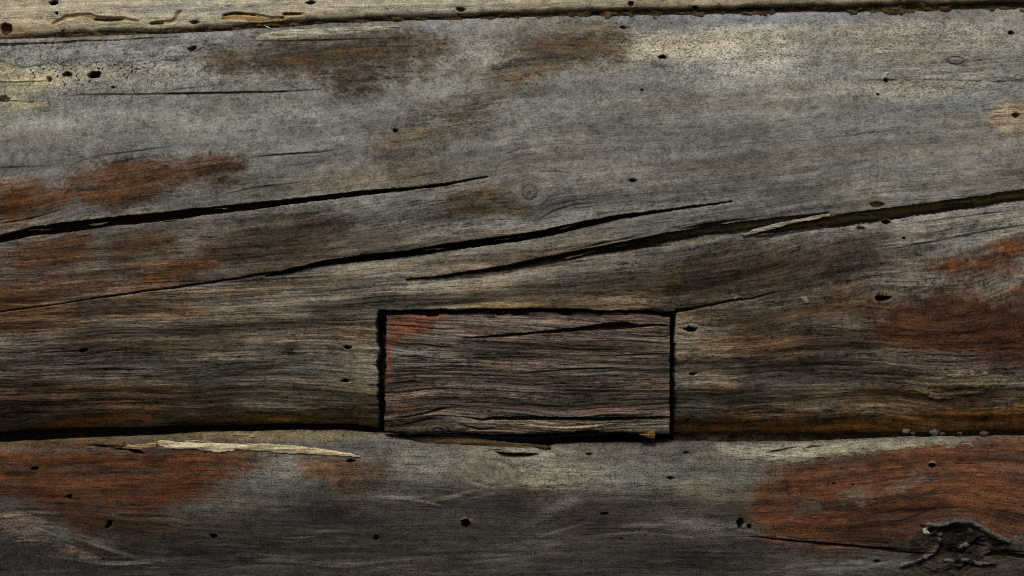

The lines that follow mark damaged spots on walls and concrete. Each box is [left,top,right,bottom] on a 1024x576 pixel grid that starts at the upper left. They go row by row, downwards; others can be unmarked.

rust [0,138,260,321]
crack [0,145,1024,313]
rust [736,436,1024,561]